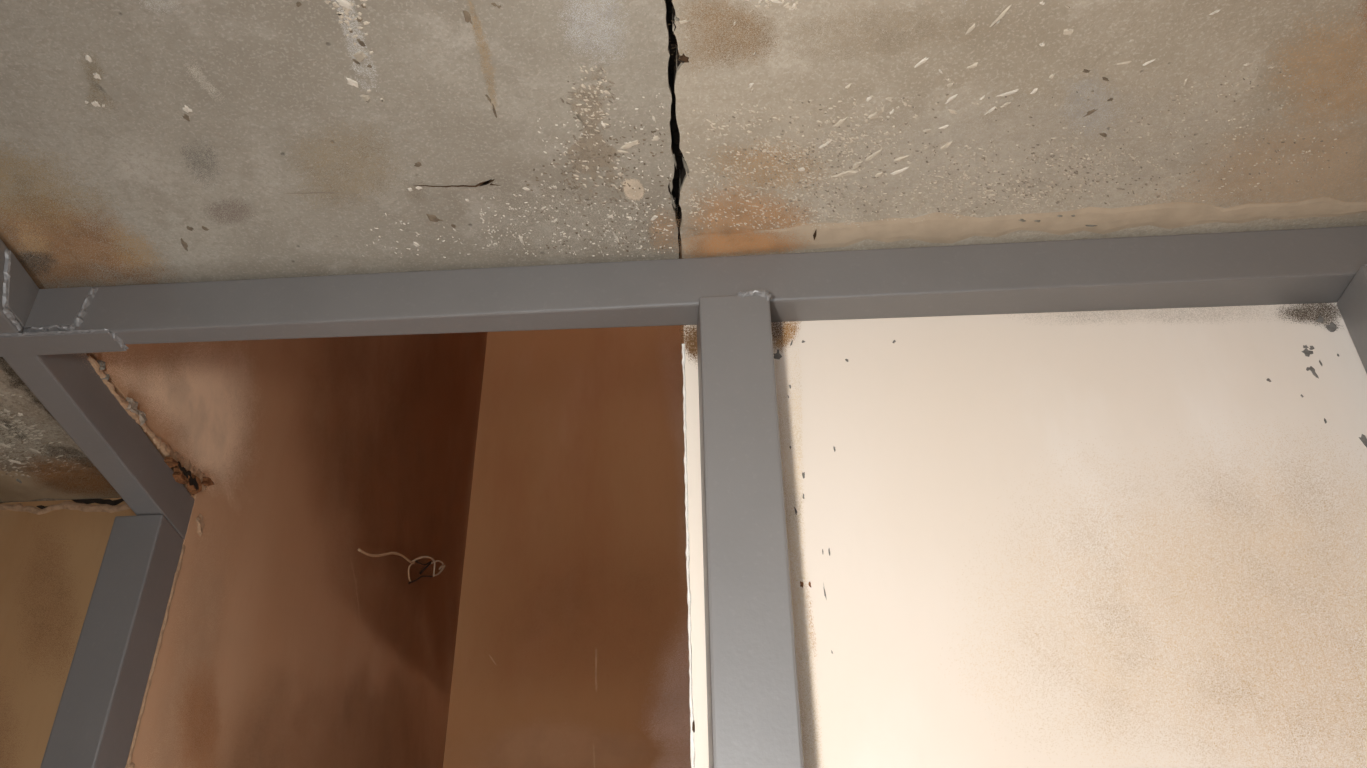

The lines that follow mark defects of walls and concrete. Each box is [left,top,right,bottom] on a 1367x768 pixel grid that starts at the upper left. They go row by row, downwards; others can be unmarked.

crack [665,0,690,259]
flaking render [88,355,214,495]
leakage [938,416,1367,768]